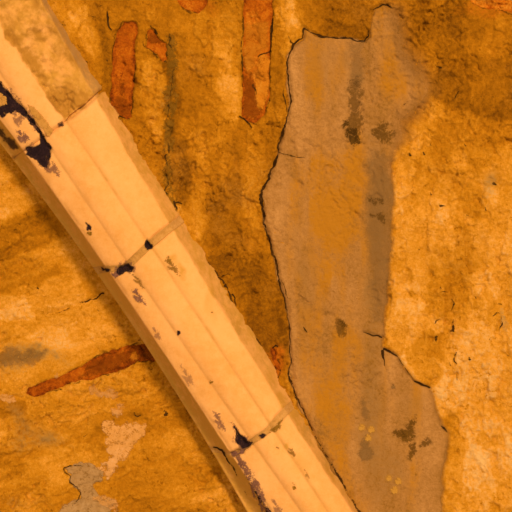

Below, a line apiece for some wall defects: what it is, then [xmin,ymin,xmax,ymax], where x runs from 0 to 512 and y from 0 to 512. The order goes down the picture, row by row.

damp [343,120,361,145]
damp [372,123,395,144]
flaking render [262,5,449,512]
flaking render [27,343,155,512]
damp [393,414,432,460]